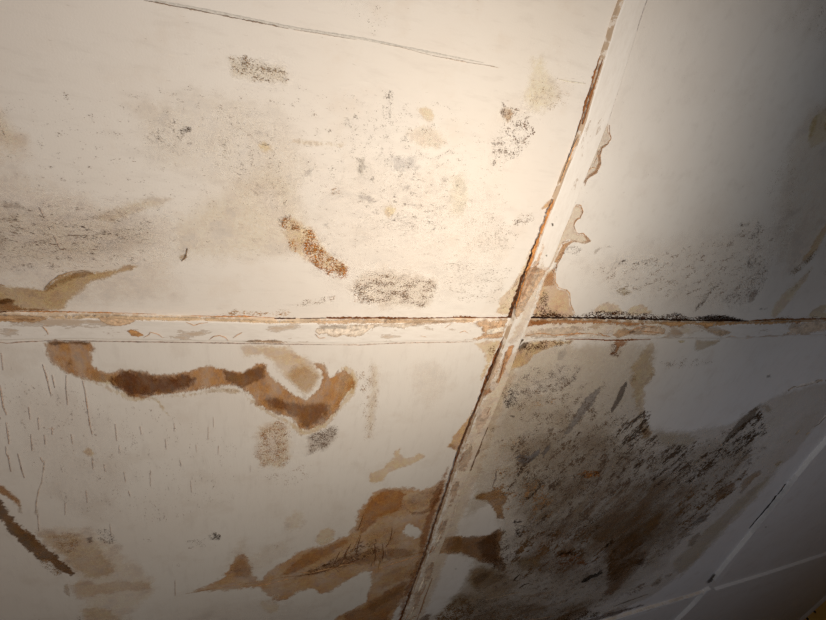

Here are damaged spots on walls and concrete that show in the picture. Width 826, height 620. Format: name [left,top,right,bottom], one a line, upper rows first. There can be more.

leakage [229,55,289,82]
leakage [345,90,468,241]
leakage [0,198,148,290]
leakage [351,273,437,307]
peeling [515,263,550,317]
leakage [531,205,826,322]
peeling [0,315,507,340]
peeling [526,319,826,339]
peeling [483,345,513,395]
peeling [611,382,627,411]
leakage [435,364,766,620]
leakage [7,520,83,576]